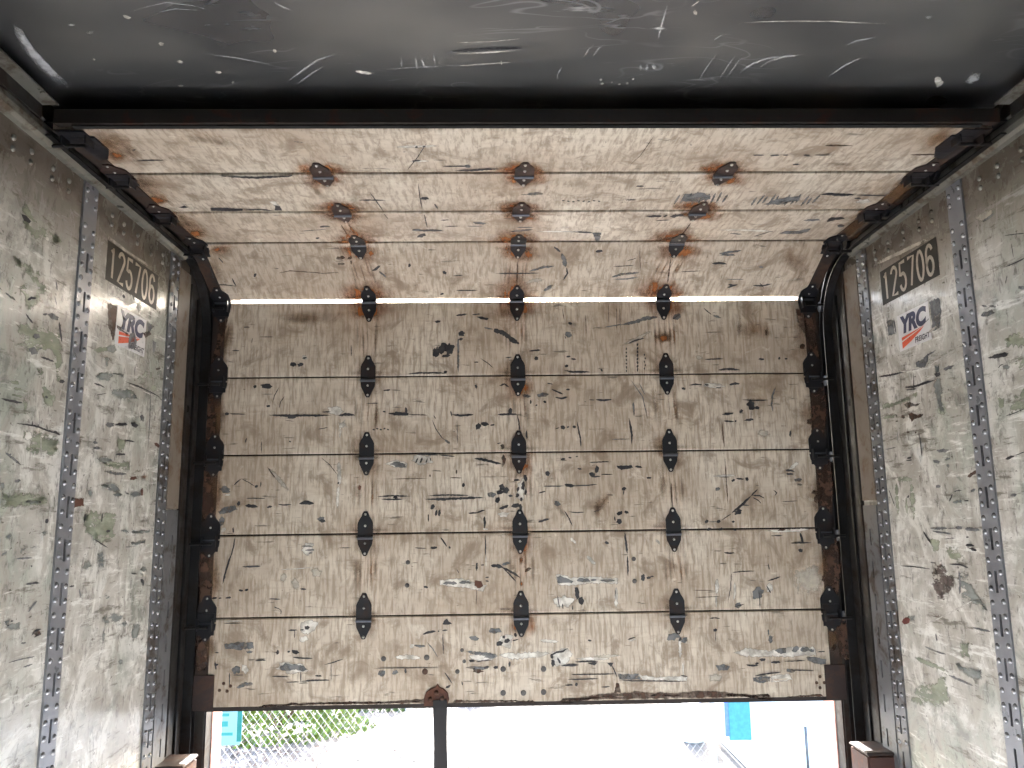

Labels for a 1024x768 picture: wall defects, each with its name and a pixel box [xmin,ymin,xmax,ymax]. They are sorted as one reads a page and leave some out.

rust [703,163,740,184]
rust [326,202,374,258]
rust [347,272,385,318]
rust [499,204,537,336]
rust [640,202,714,314]
rust [807,382,827,434]
rust [812,459,834,513]
rust [199,552,214,603]
rust [822,537,841,595]
rust [195,636,209,672]